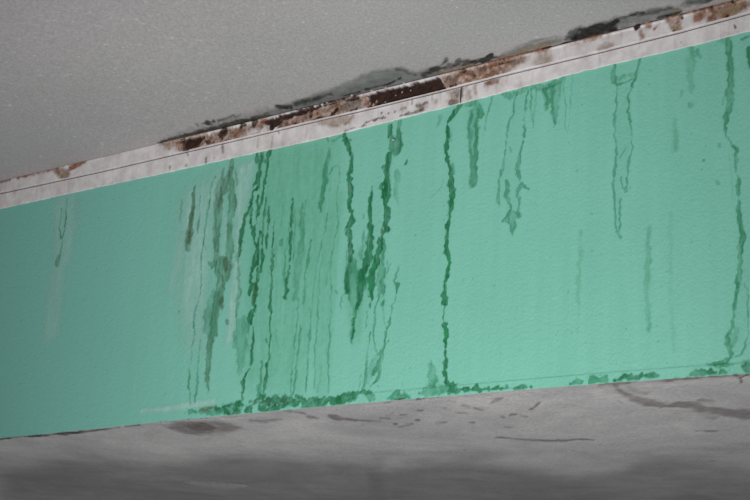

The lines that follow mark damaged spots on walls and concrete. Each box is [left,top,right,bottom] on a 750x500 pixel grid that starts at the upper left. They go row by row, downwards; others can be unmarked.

leakage [518,7,681,52]
corrosion [665,0,750,31]
leakage [422,53,509,76]
corrosion [444,46,551,88]
leakage [159,113,270,143]
corrosion [278,96,367,128]
leakage [318,163,328,210]
leakage [342,133,355,262]
leakage [441,85,484,306]
leakage [356,152,391,310]
leakage [736,206,746,254]
leakage [184,161,253,390]